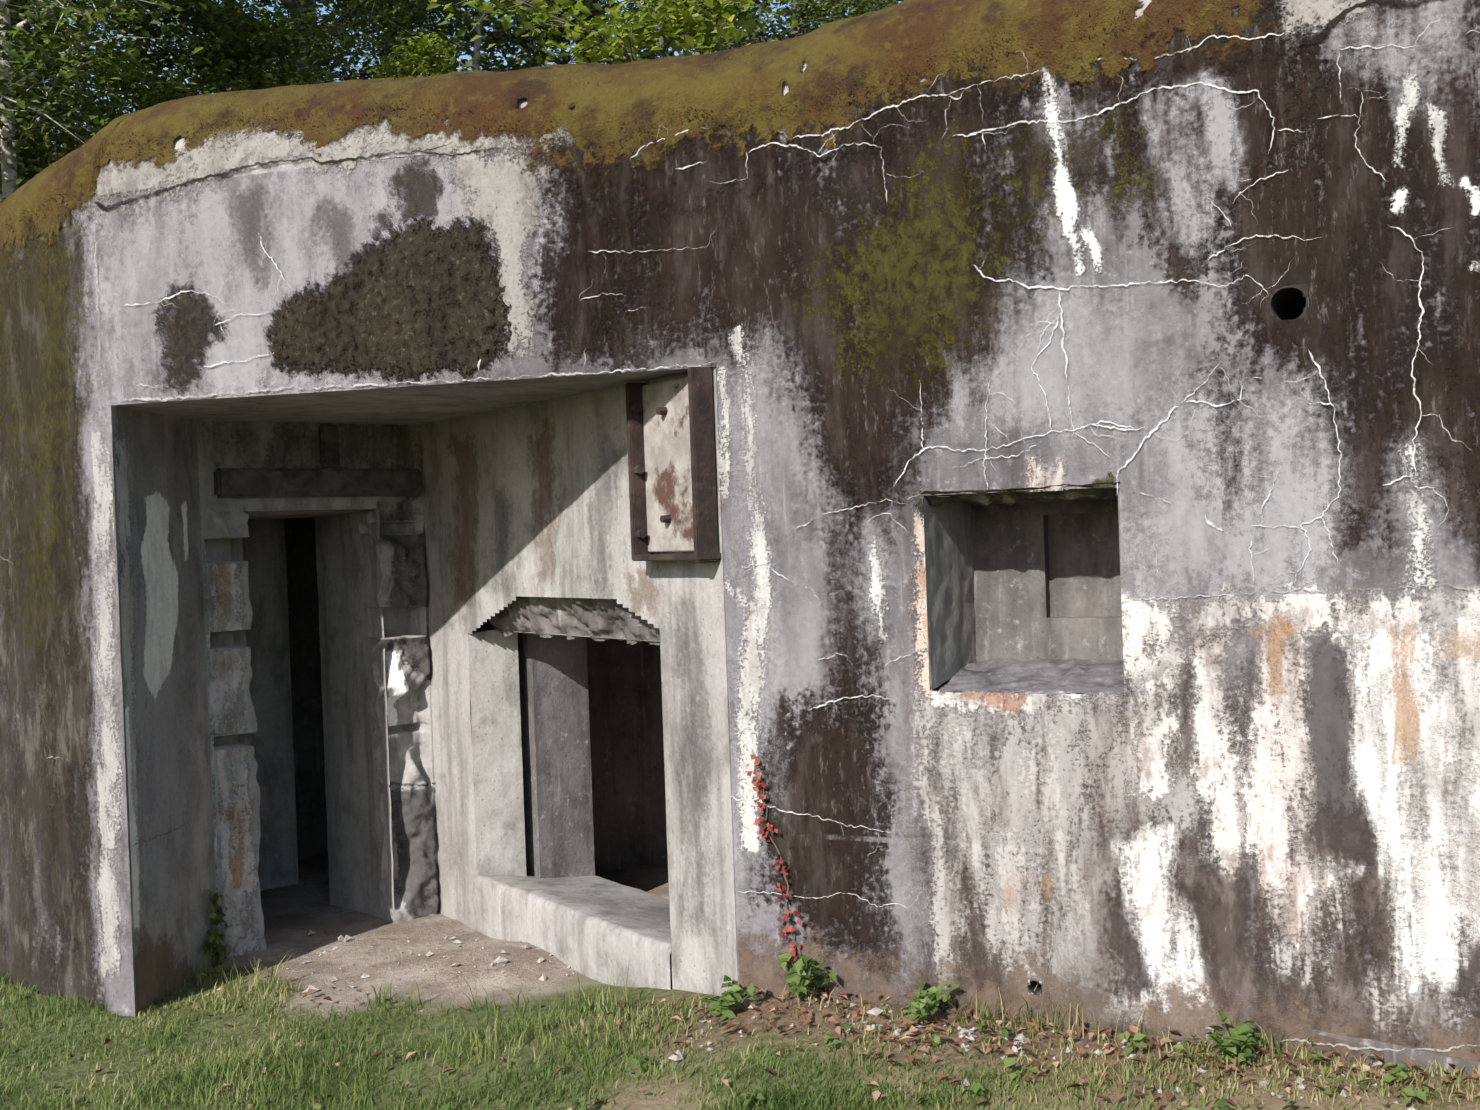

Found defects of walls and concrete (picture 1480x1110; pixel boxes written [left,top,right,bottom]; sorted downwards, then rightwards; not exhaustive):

crack [630,126,716,170]
crack [746,0,1436,586]
water stain [521,0,1480,1057]
water stain [0,155,501,1015]
crack [743,563,820,604]
crack [813,652,915,708]
rust [1256,616,1292,695]
rust [1392,628,1418,763]
crack [732,796,890,833]
crack [738,891,906,908]